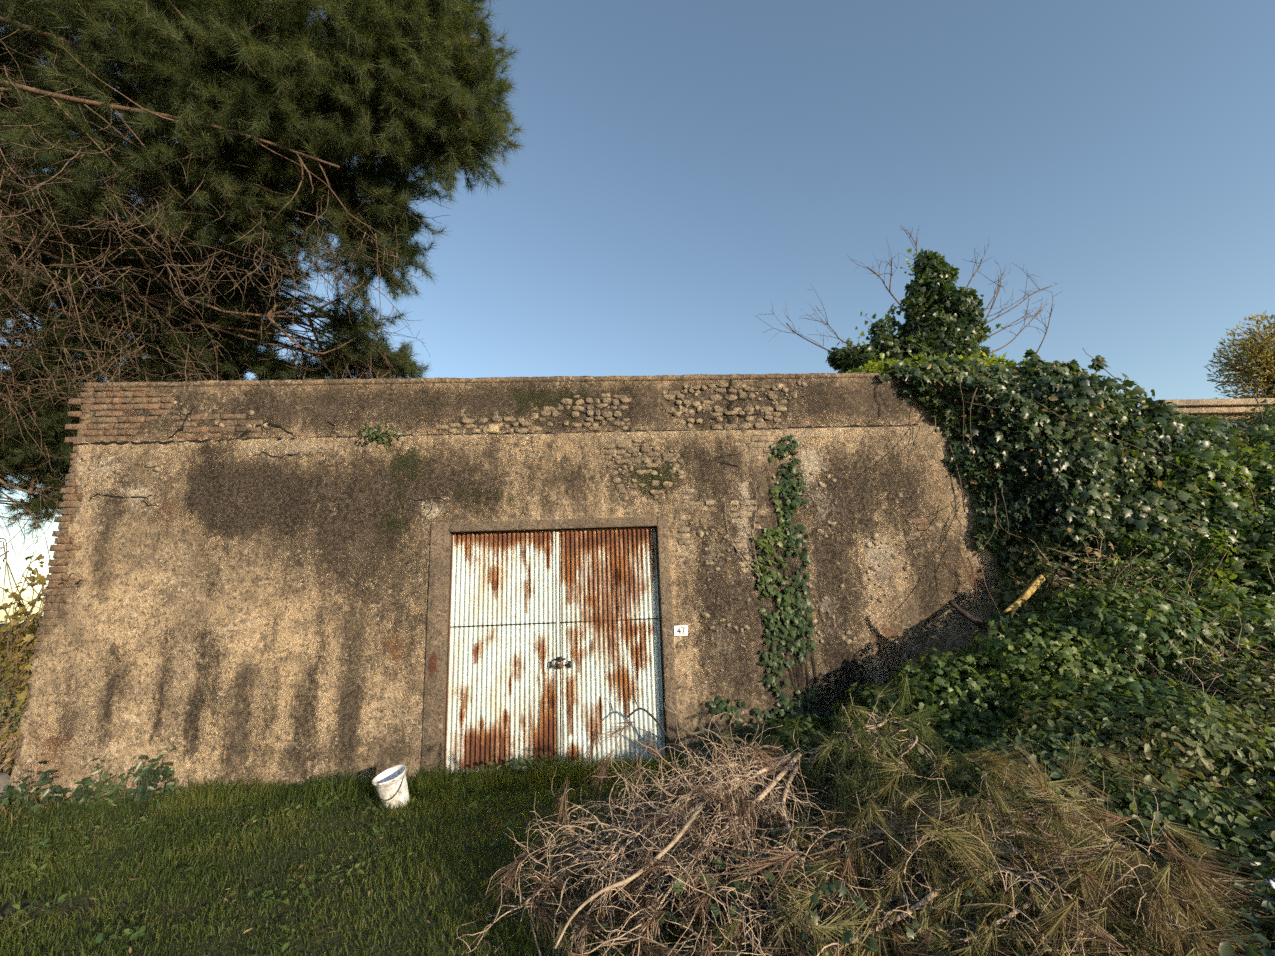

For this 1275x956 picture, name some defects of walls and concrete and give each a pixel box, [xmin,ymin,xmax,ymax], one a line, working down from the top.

leakage [86,378,964,781]
corrosion [454,529,656,771]